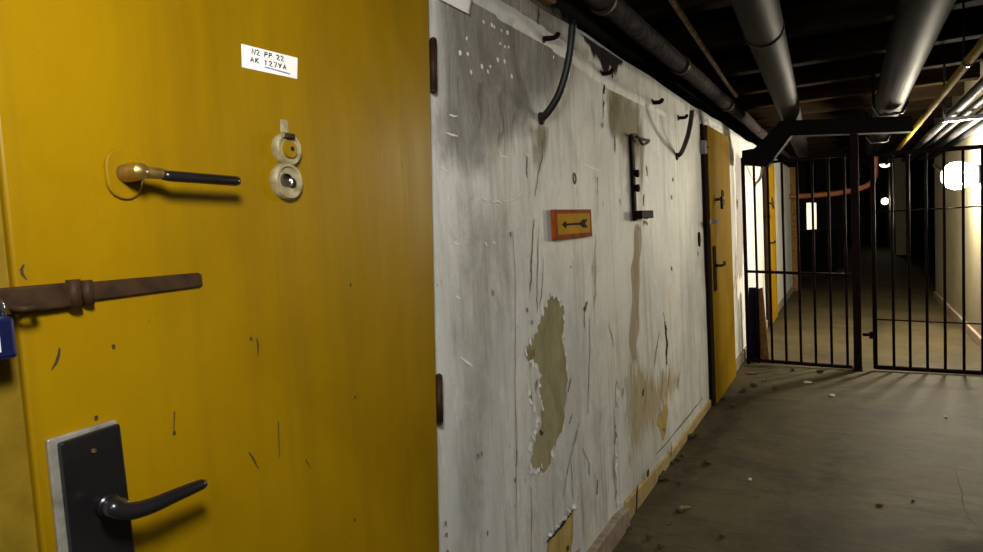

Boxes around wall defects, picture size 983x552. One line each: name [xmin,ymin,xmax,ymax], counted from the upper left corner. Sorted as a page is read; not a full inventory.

peeling [525,291,568,476]
peeling [625,362,679,445]
spalling [547,504,580,552]